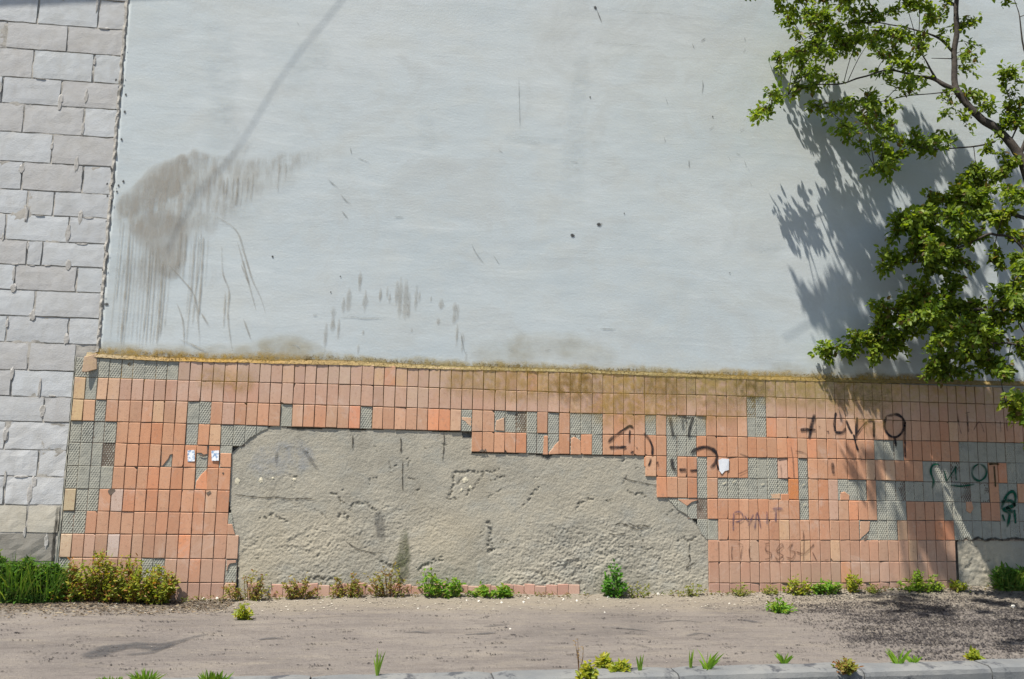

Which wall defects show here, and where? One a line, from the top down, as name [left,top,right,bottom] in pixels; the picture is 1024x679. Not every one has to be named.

peeling [61,358,179,534]
spalling [186,397,809,598]
peeling [838,440,1024,587]